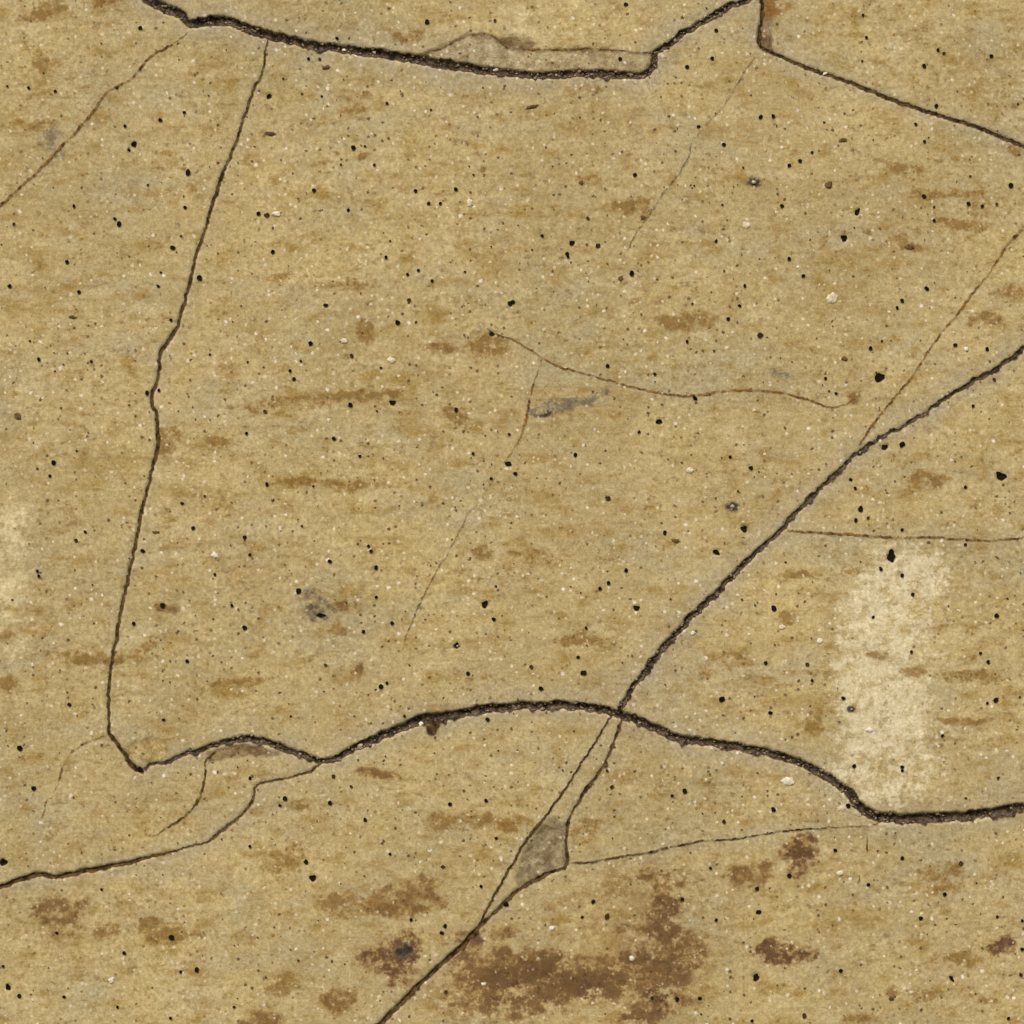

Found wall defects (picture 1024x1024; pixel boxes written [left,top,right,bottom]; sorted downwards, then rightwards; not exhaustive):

crack [0,34,186,206]
crack [142,0,751,81]
crack [756,0,1024,148]
crack [918,279,984,366]
crack [991,230,1022,271]
crack [106,40,268,773]
crack [0,328,1024,1024]